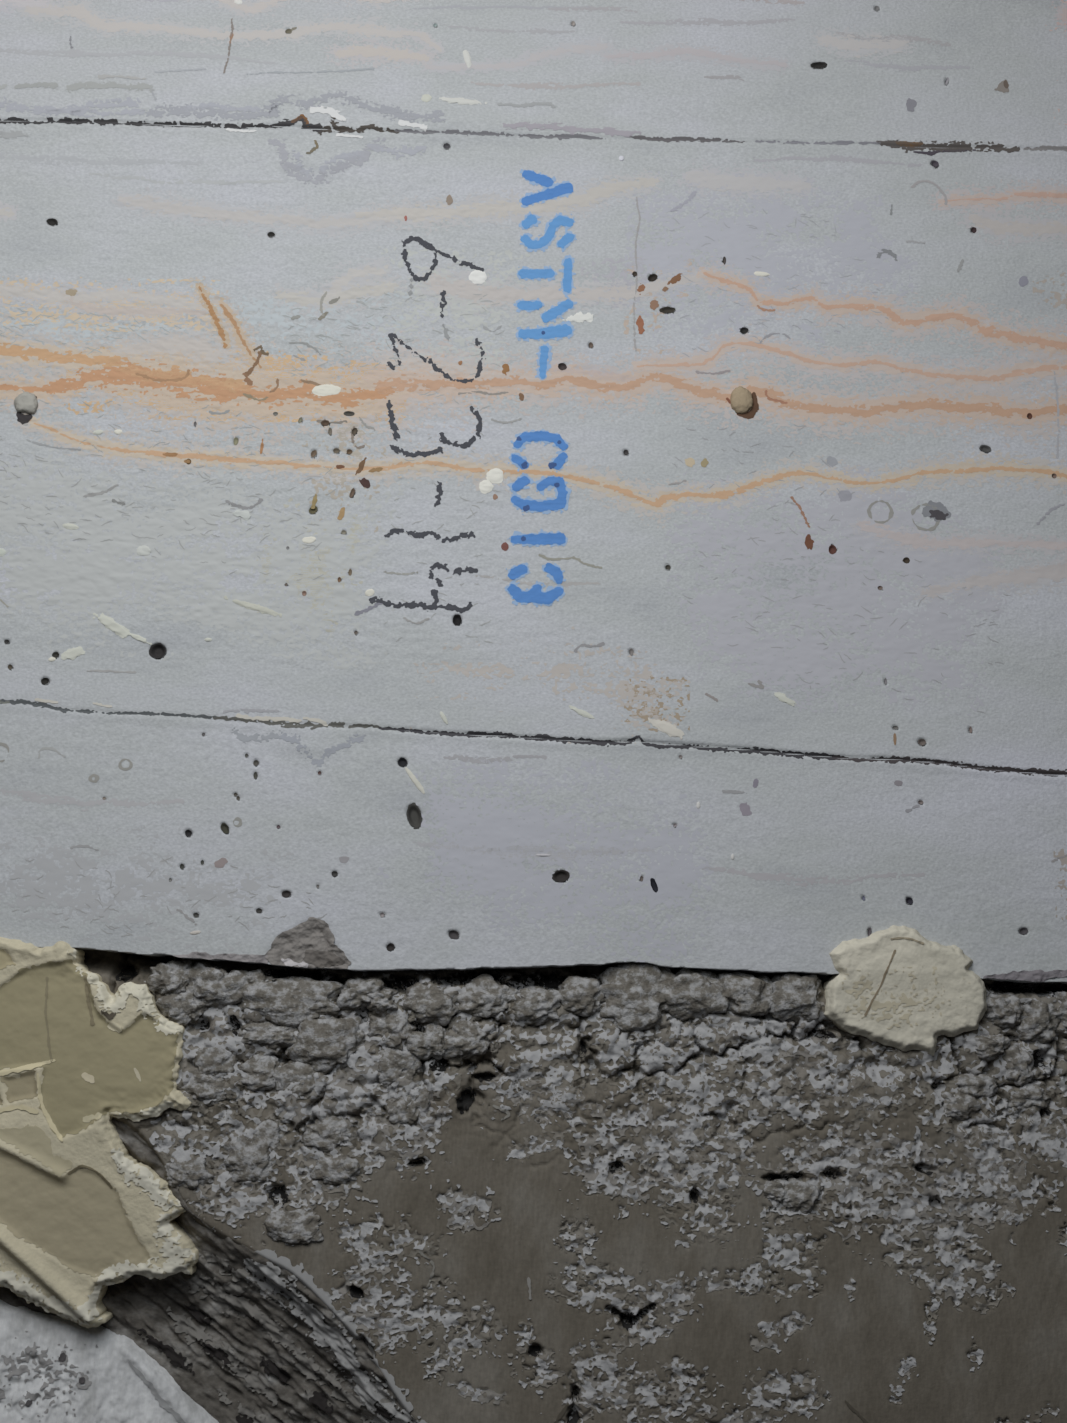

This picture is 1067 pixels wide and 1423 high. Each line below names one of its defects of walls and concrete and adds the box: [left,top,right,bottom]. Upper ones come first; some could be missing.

rust [0,256,1067,530]
crack [0,291,522,643]
crack [538,554,602,569]
crack [669,390,1010,700]
crack [1036,504,1065,525]
crack [87,667,136,675]
crack [574,642,605,653]
crack [0,699,1067,776]
crack [722,788,745,796]
flaking render [144,917,1067,1423]